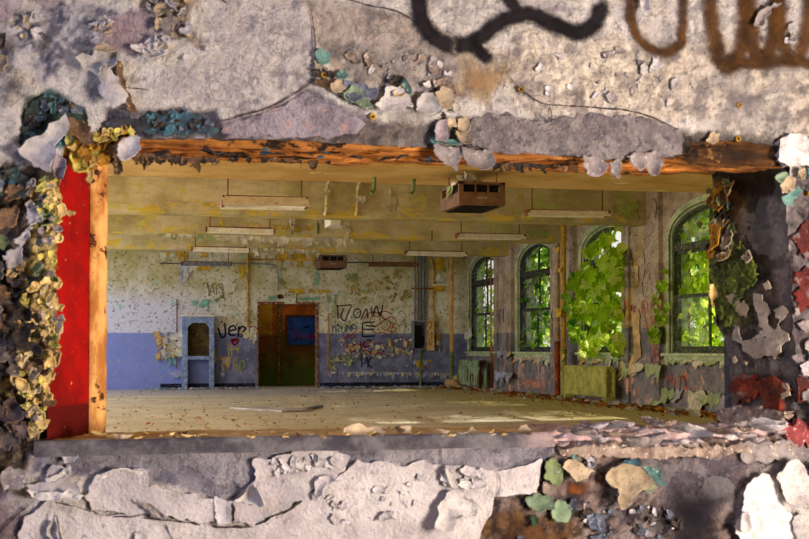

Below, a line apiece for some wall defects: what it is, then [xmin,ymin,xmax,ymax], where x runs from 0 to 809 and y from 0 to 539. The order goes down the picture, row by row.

peeling [0,0,43,49]
peeling [130,0,196,60]
crack [216,2,370,123]
crack [350,0,415,21]
peeling [311,48,663,179]
flaking render [774,133,809,207]
peeling [0,19,331,456]
peeling [699,177,736,264]
peeling [0,218,809,539]
crack [55,500,303,539]
leakage [669,494,718,539]